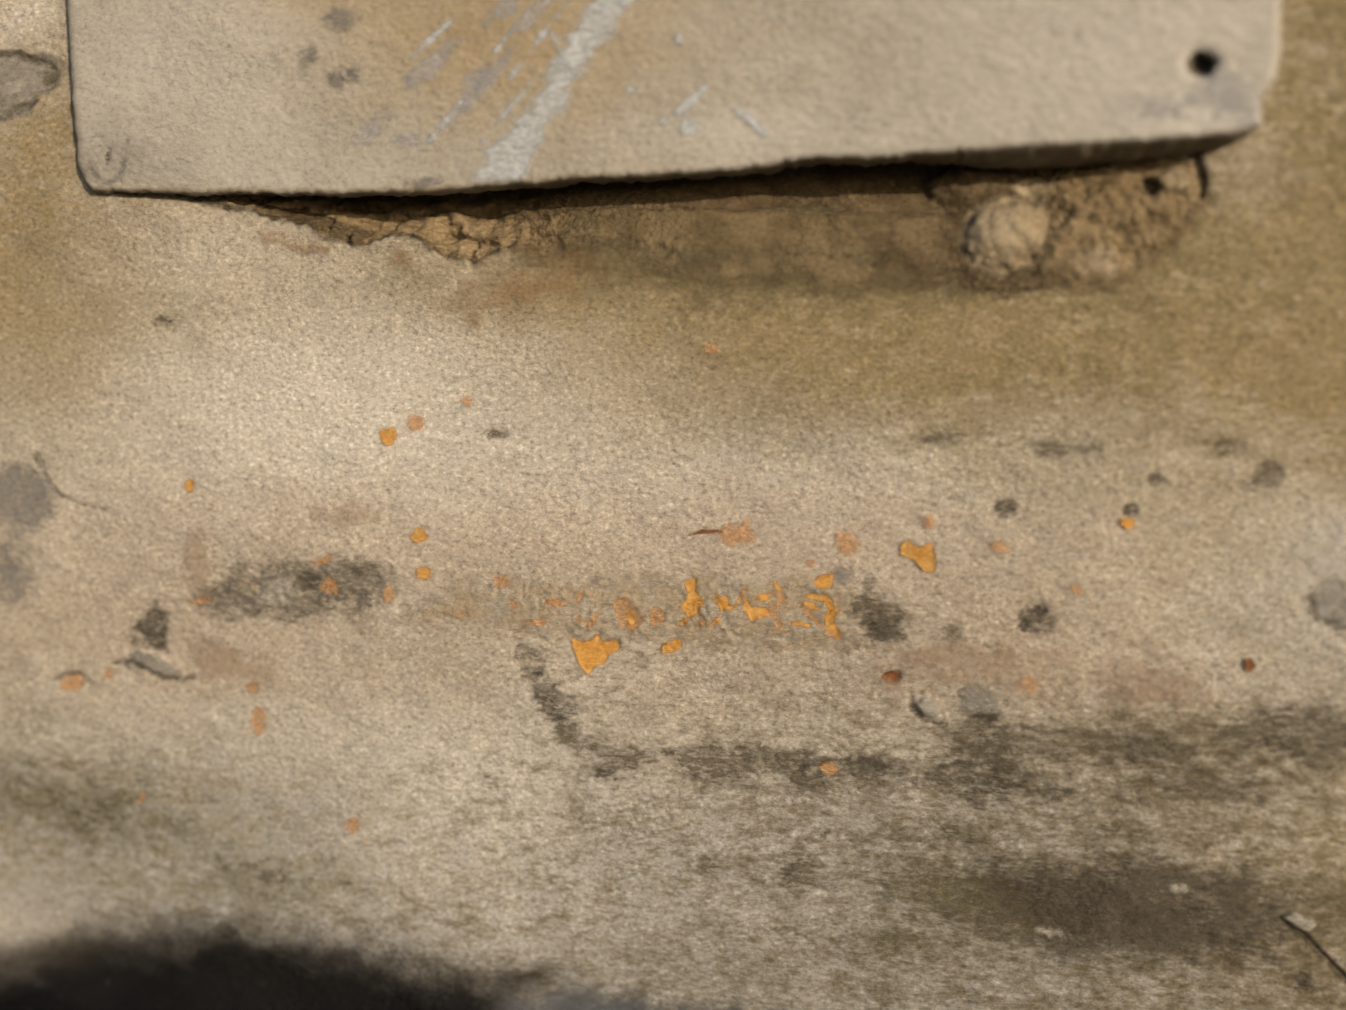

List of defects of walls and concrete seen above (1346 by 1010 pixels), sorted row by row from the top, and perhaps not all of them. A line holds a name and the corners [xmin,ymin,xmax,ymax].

spalling [208,154,1212,295]
spalling [124,605,178,678]
water stain [0,930,643,1010]
crack [1280,912,1346,982]